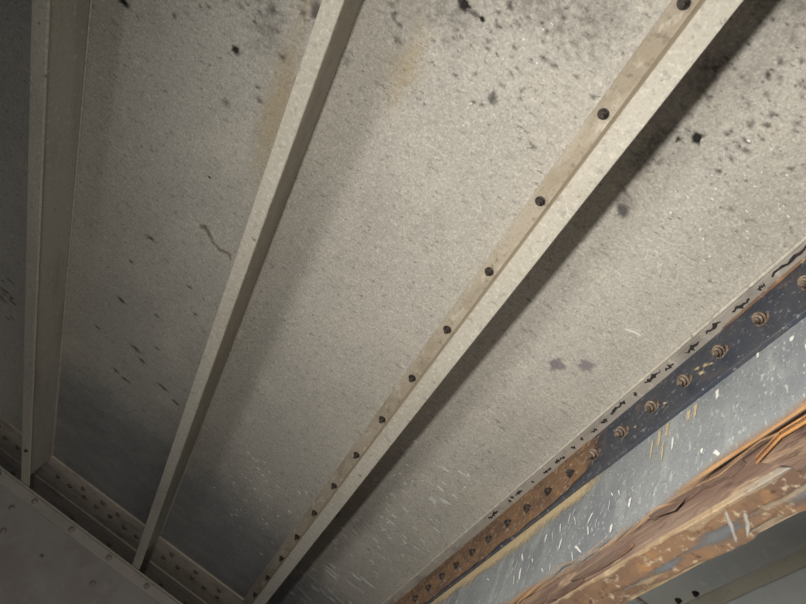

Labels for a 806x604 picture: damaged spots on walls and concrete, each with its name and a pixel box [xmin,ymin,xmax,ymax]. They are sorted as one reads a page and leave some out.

peeling [771,245,806,278]
corrosion [394,436,599,604]
peeling [530,543,634,604]
corrosion [509,400,806,604]